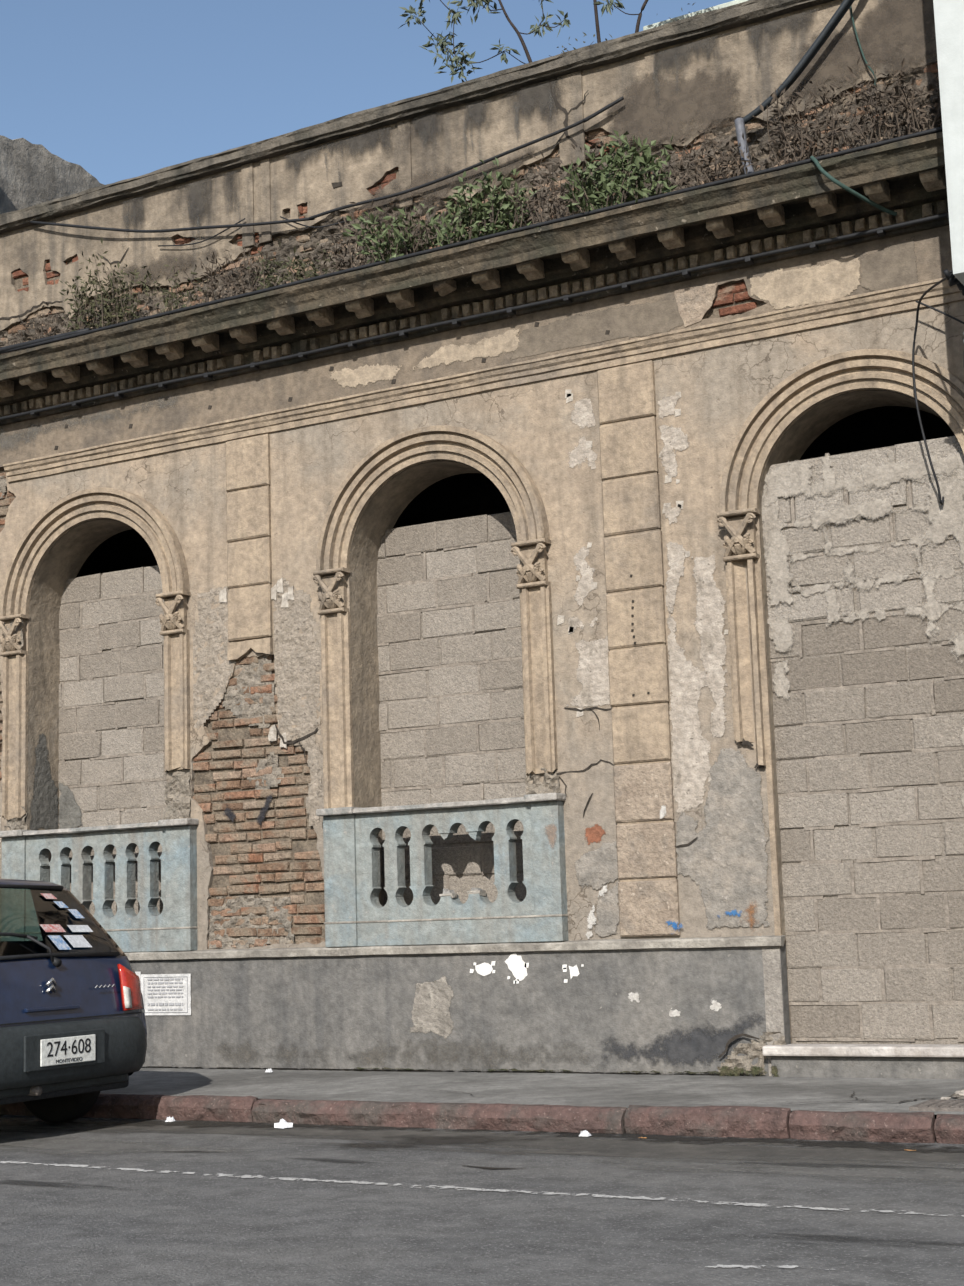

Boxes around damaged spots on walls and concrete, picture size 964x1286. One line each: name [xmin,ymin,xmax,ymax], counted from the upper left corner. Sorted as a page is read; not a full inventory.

water stain [513,78,559,134]
water stain [186,170,236,225]
water stain [286,126,390,172]
water stain [327,148,533,218]
flaking render [0,63,942,353]
water stain [109,247,227,288]
flaking render [657,392,690,484]
peeling [762,449,964,652]
flaking render [665,541,728,813]
flaking render [164,577,325,949]
peeling [470,961,529,984]
water stain [604,1016,763,1066]